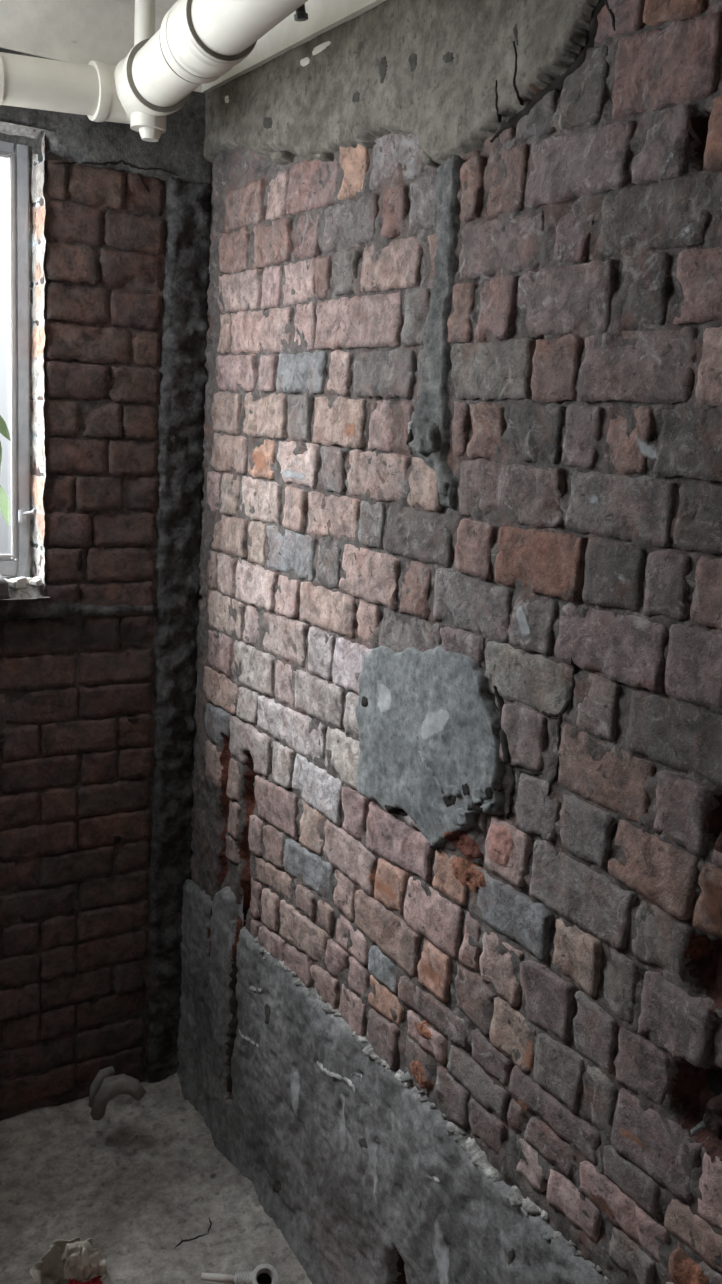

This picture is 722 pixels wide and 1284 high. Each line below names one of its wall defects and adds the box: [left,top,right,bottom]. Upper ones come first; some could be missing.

flaking render [203,0,599,169]
crack [490,0,615,143]
spalling [443,824,514,893]
spalling [244,920,613,1283]
spalling [671,1256,709,1284]